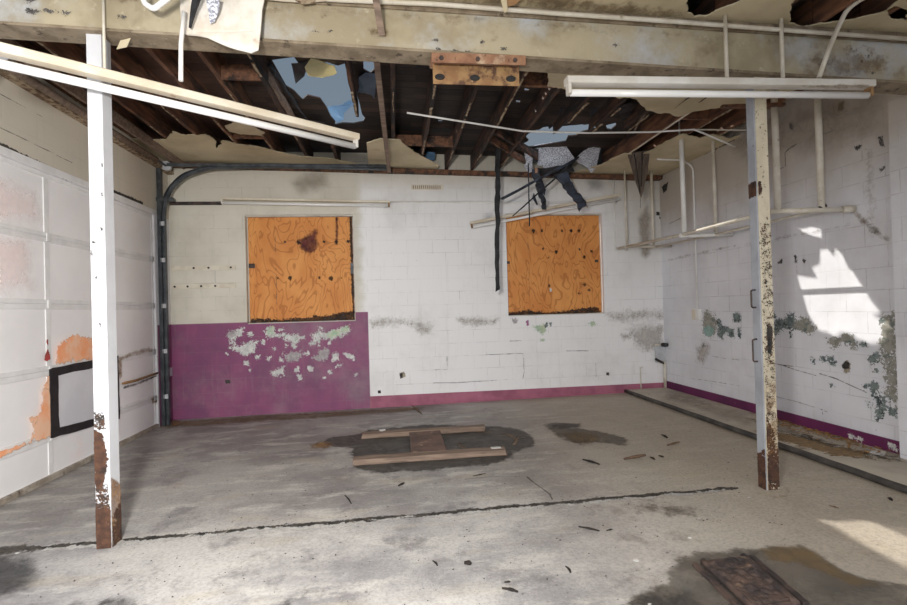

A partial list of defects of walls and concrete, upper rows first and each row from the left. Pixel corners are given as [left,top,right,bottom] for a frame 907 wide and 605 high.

peeling [225,324,355,381]
peeling [698,308,742,359]
peeling [773,311,898,423]
rust [94,430,109,489]
leakage [548,423,627,445]
rust [757,404,780,490]
crack [0,541,97,555]
rust [95,502,122,549]
crack [118,476,739,546]
leakage [629,546,907,605]